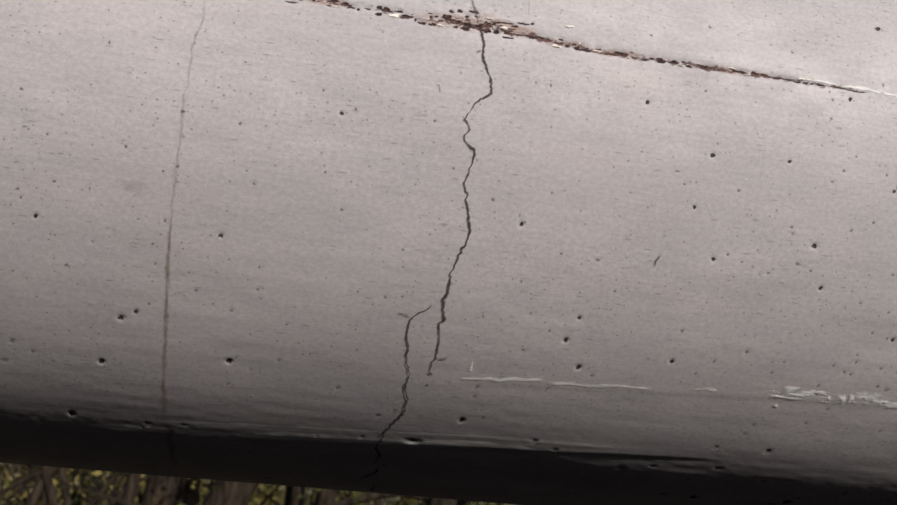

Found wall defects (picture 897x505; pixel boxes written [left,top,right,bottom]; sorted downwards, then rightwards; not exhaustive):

crack [362,30,493,491]
spalling [283,0,867,93]